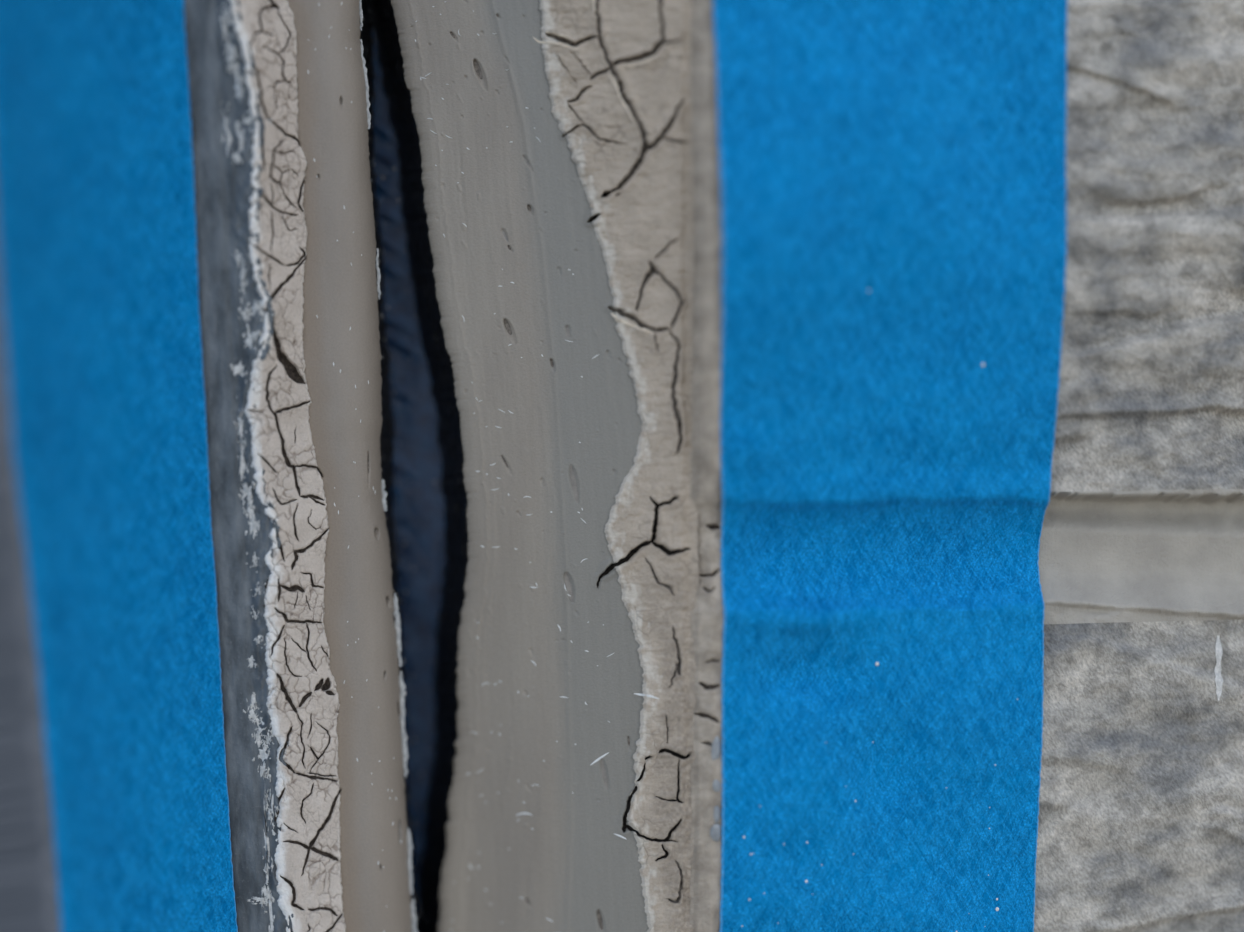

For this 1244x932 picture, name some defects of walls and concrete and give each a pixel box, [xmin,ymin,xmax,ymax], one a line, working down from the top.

crack [229,0,346,932]
crack [533,0,720,932]